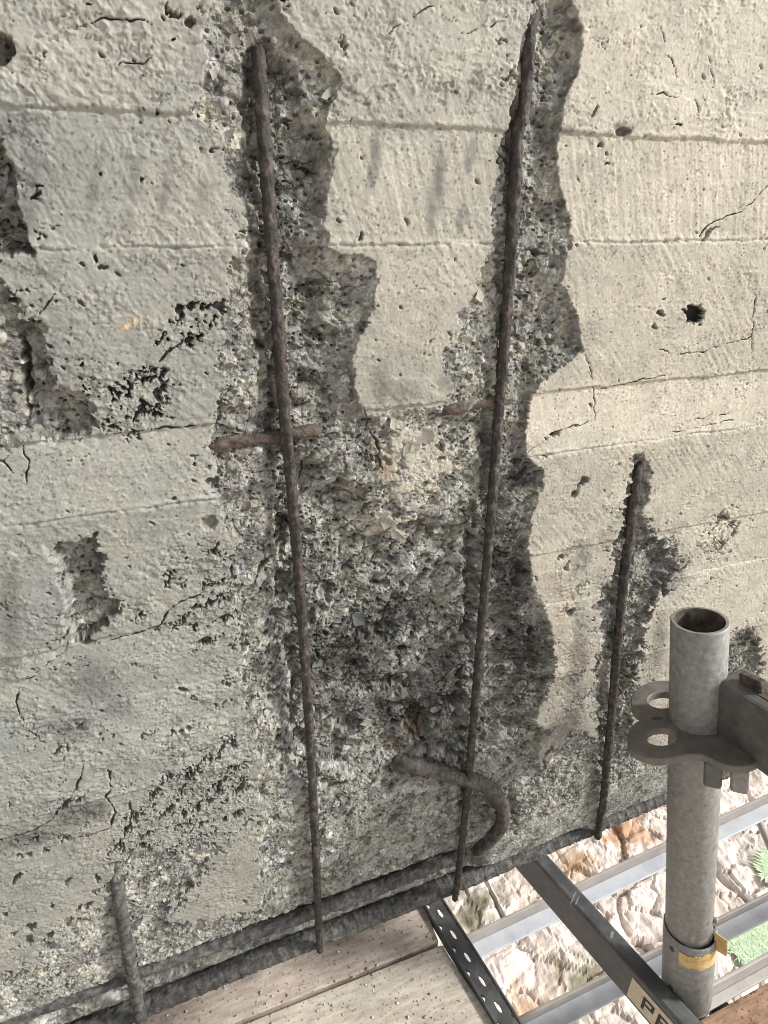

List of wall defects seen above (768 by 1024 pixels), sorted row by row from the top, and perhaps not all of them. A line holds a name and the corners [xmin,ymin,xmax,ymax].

crack [0,764,131,852]
spalling [0,0,541,1024]
spalling [392,0,687,891]
crack [528,295,756,452]